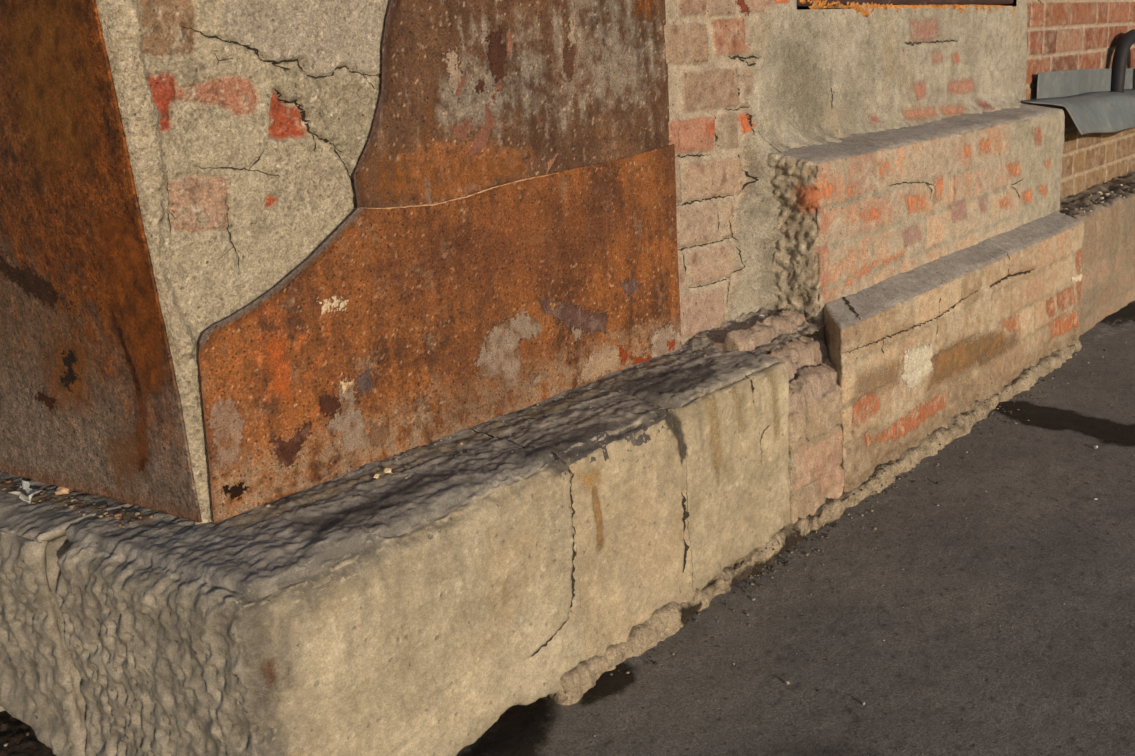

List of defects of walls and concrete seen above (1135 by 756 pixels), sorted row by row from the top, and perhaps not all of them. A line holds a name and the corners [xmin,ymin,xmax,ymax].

spalling [735,0,750,16]
corrosion [473,25,508,96]
corrosion [563,38,577,83]
crack [182,26,381,181]
crack [219,200,240,270]
corrosion [0,251,77,312]
peeling [316,296,349,314]
peeling [473,310,544,394]
corrosion [264,391,341,474]
water stain [233,355,716,549]
crack [529,467,576,658]
crack [681,492,690,573]